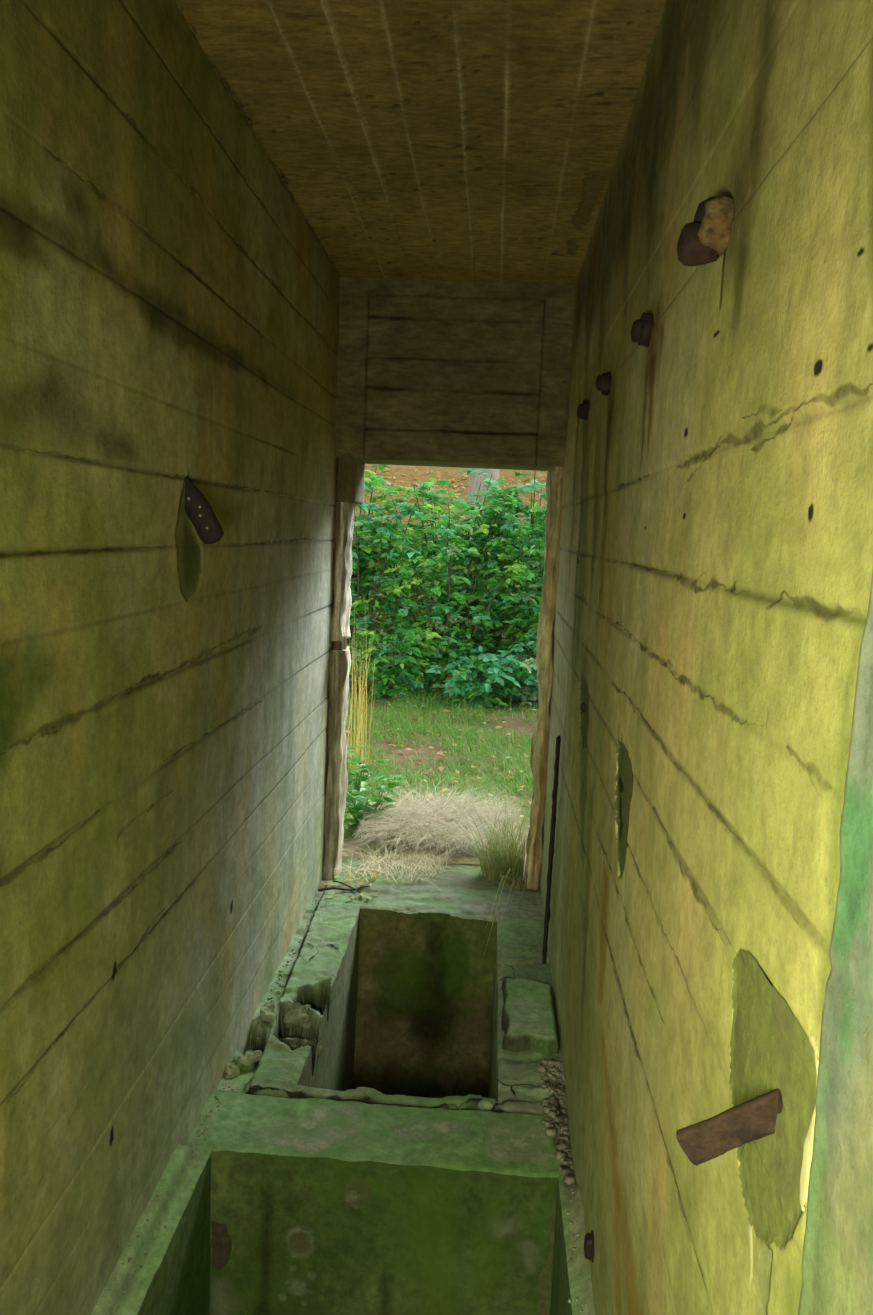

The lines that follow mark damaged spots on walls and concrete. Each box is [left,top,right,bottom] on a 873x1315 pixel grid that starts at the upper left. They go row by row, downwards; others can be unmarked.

crack [829,384,873,403]
crack [694,409,792,462]
crack [643,566,736,592]
crack [770,590,821,612]
spalling [579,667,589,749]
spalling [614,734,634,879]
spalling [249,908,498,1101]
spalling [729,949,819,1315]
spalling [137,1107,572,1315]